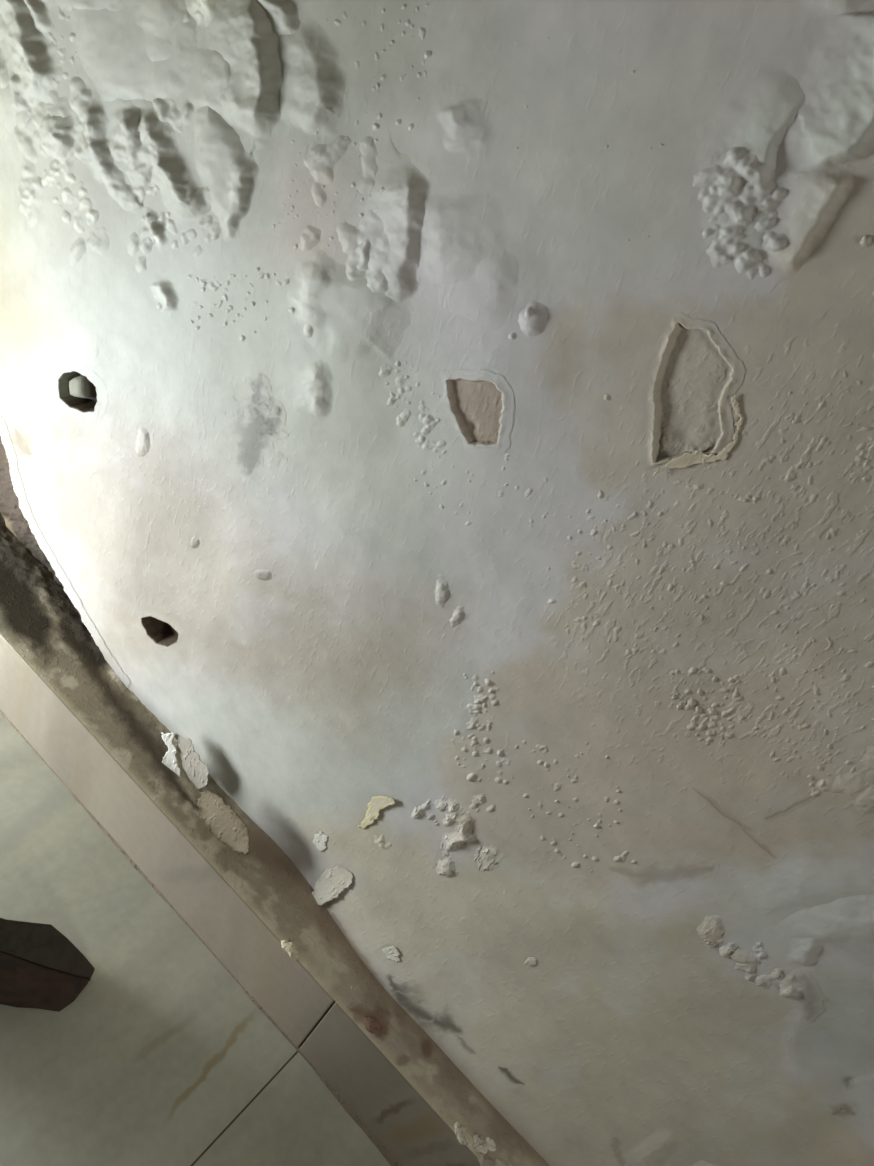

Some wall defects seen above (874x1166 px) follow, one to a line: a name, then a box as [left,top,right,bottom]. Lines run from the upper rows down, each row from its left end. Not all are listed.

peeling [434,368,515,455]
peeling [642,313,746,476]
flaking render [0,415,130,688]
water stain [0,168,522,819]
water stain [277,153,874,1166]
peeling [161,732,250,854]
peeling [358,796,395,850]
spalling [411,793,500,878]